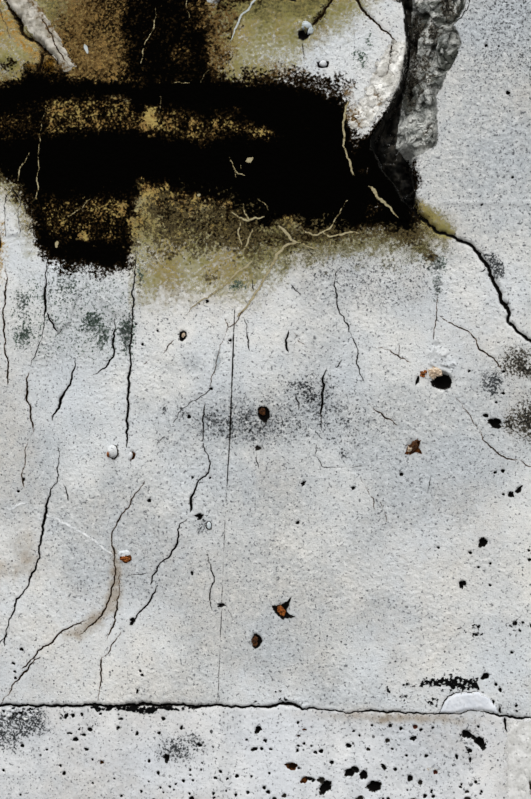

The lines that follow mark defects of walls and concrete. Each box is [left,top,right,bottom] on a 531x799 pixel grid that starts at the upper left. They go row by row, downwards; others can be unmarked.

crack [0,108,46,248]
leakage [0,0,531,360]
spalling [348,0,466,209]
crack [342,99,531,342]
crack [0,199,531,731]